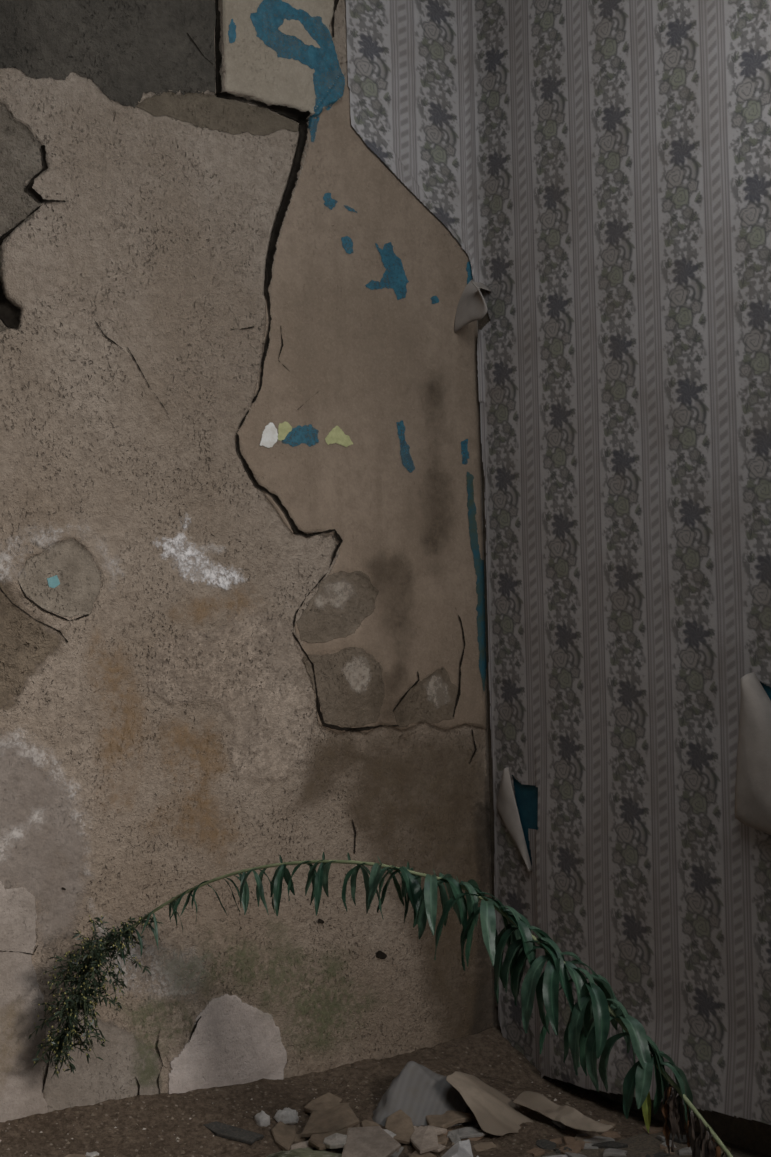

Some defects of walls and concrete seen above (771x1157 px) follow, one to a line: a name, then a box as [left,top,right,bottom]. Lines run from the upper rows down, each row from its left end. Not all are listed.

peeling [228,19,236,43]
peeling [278,19,320,48]
spalling [137,91,323,142]
spalling [0,103,47,332]
crack [0,145,66,246]
crack [187,0,419,732]
leakage [157,526,243,589]
spalling [0,577,68,710]
crack [453,608,477,764]
peeling [0,742,287,1122]